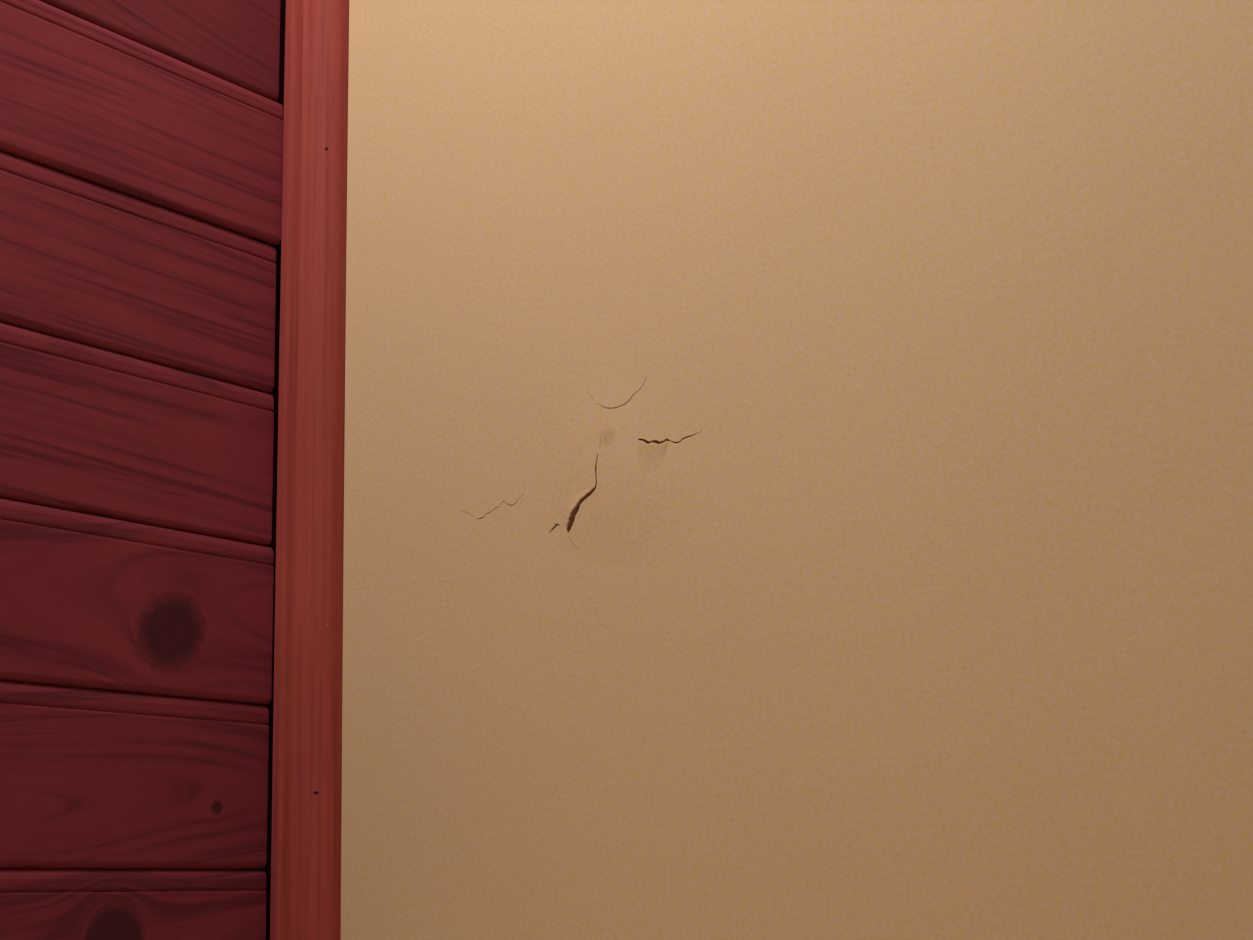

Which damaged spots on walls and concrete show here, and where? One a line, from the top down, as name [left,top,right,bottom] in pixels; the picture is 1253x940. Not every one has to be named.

crack [636,431,702,473]
crack [550,456,598,546]